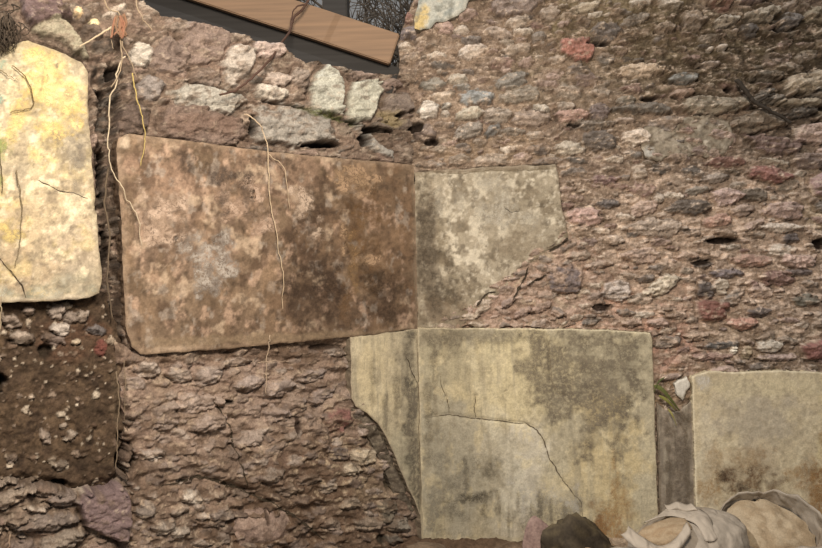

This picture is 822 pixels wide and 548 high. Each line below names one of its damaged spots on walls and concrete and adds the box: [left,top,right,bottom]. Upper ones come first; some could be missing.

crack [407,170,583,516]
crack [161,401,324,540]
water stain [403,377,420,498]